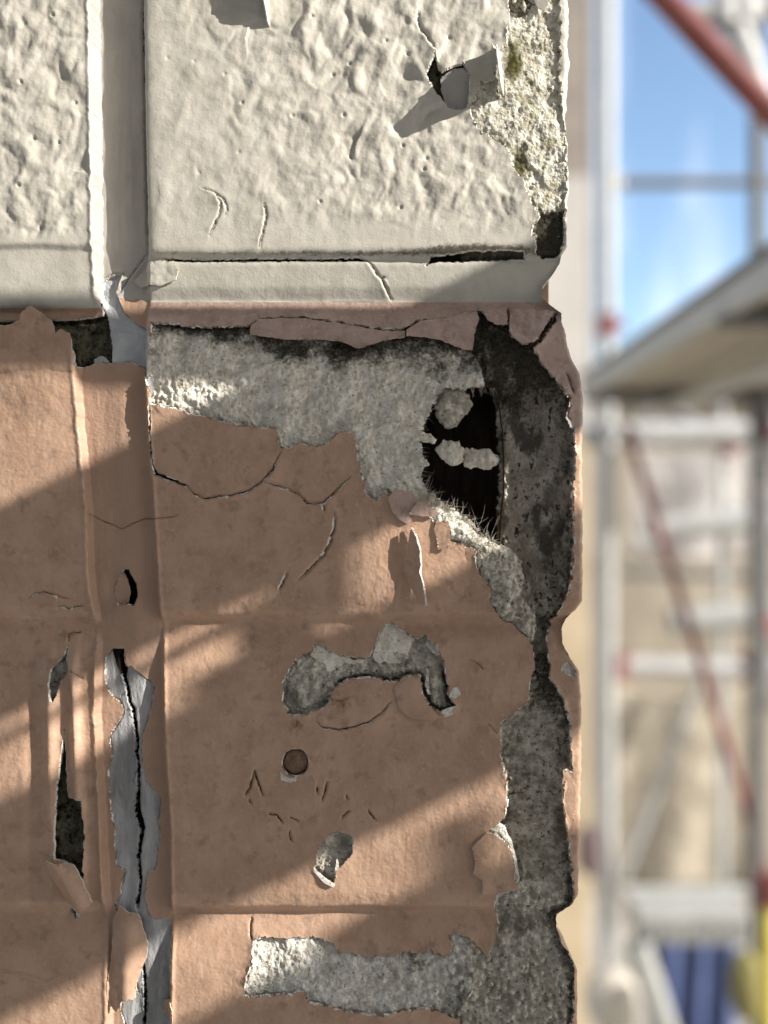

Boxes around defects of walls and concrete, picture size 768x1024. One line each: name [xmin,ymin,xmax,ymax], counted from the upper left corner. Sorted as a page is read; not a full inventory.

spalling [430,0,566,254]
crack [106,207,388,294]
crack [426,251,524,266]
water stain [156,311,568,416]
crack [150,421,350,588]
spalling [146,308,576,1024]
peeling [107,906,149,1012]